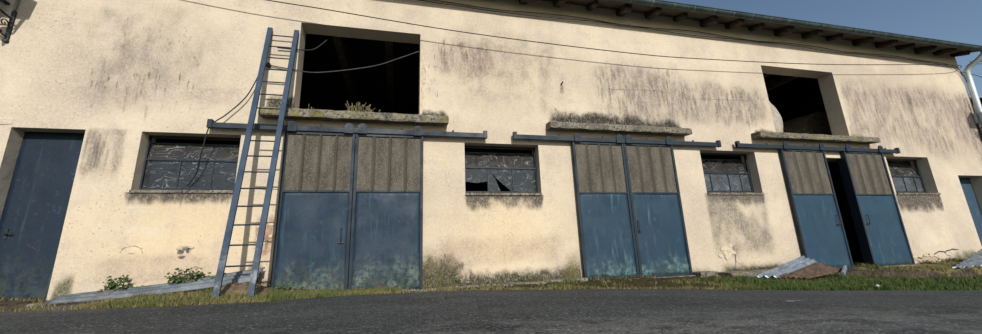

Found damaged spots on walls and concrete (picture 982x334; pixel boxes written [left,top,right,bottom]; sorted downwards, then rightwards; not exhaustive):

leakage [552,78,680,128]
spalling [176,245,194,258]
leakage [422,258,582,290]